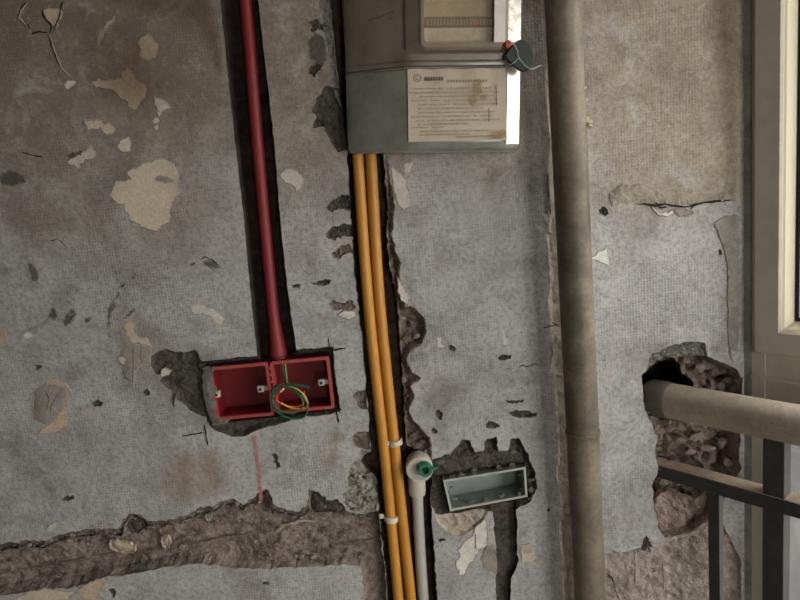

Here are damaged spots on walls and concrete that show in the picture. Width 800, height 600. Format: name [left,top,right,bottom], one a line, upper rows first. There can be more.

crack [18,0,69,76]
peeling [91,67,172,130]
peeling [138,34,158,61]
spalling [309,0,348,152]
peeling [111,158,183,232]
peeling [280,169,305,192]
crack [609,184,734,217]
spalling [151,347,341,437]
spalling [384,154,539,576]
spalling [0,431,387,600]
spalling [605,412,742,600]